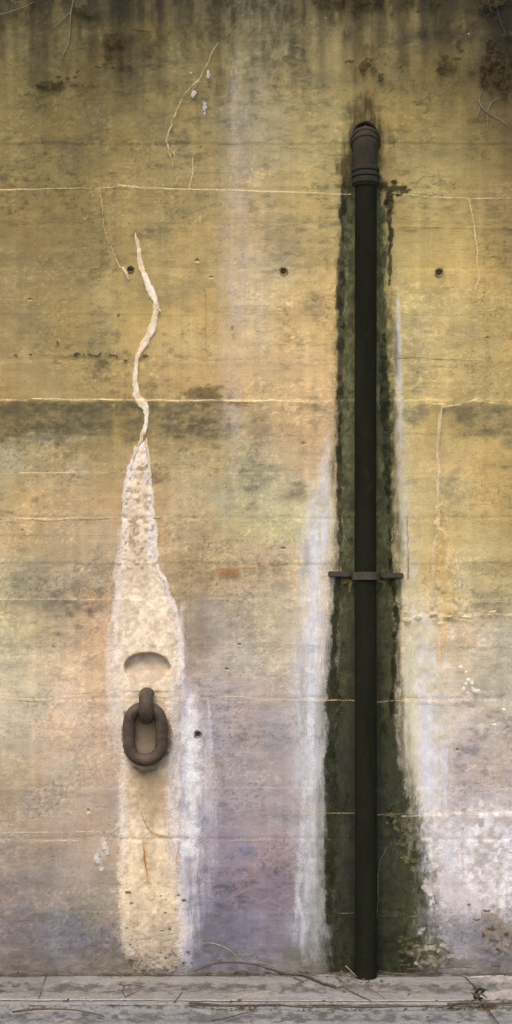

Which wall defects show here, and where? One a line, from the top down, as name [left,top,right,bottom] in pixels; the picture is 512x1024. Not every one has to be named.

leakage [108,442,212,972]
leakage [296,97,382,943]
leakage [386,191,395,285]
leakage [378,322,512,922]